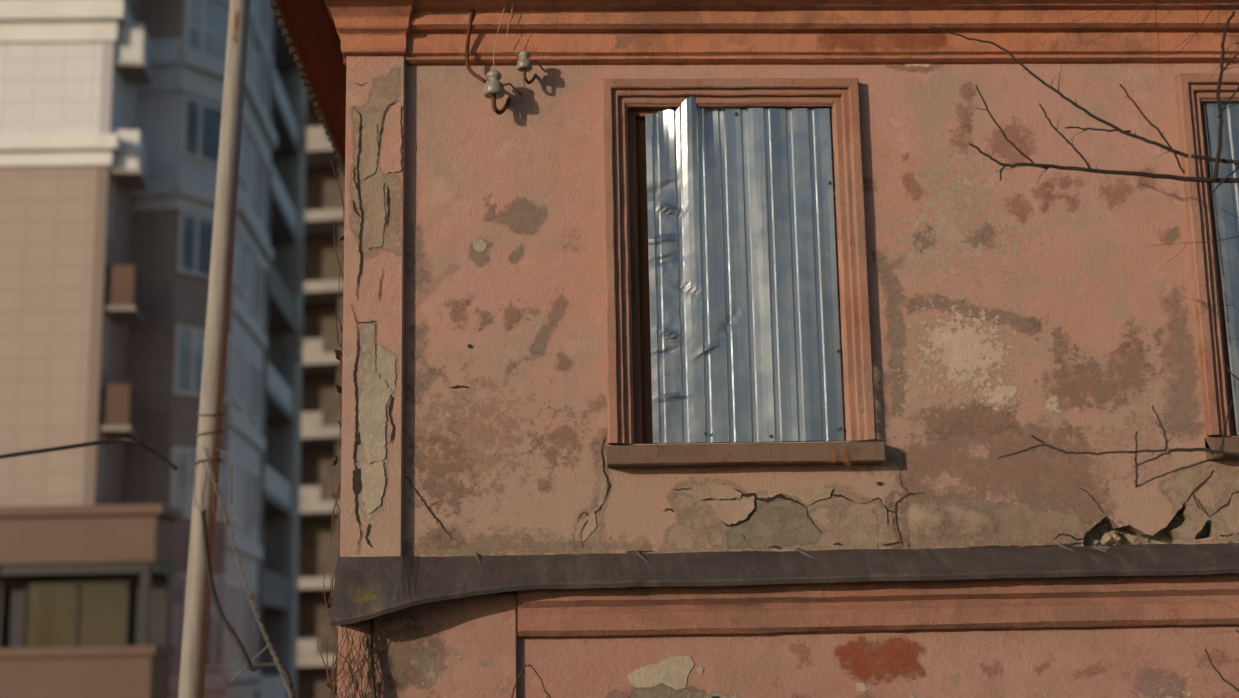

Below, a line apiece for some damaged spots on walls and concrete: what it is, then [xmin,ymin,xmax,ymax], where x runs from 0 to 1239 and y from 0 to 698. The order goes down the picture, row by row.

peeling [349,68,403,257]
peeling [483,197,547,263]
peeling [445,295,571,370]
peeling [860,251,1039,440]
peeling [356,321,397,519]
crack [406,476,453,540]
crack [577,433,610,545]
crack [663,460,918,552]
crack [969,534,1084,548]
spalling [1082,412,1239,546]
crack [1186,471,1239,537]
peeling [606,655,737,698]